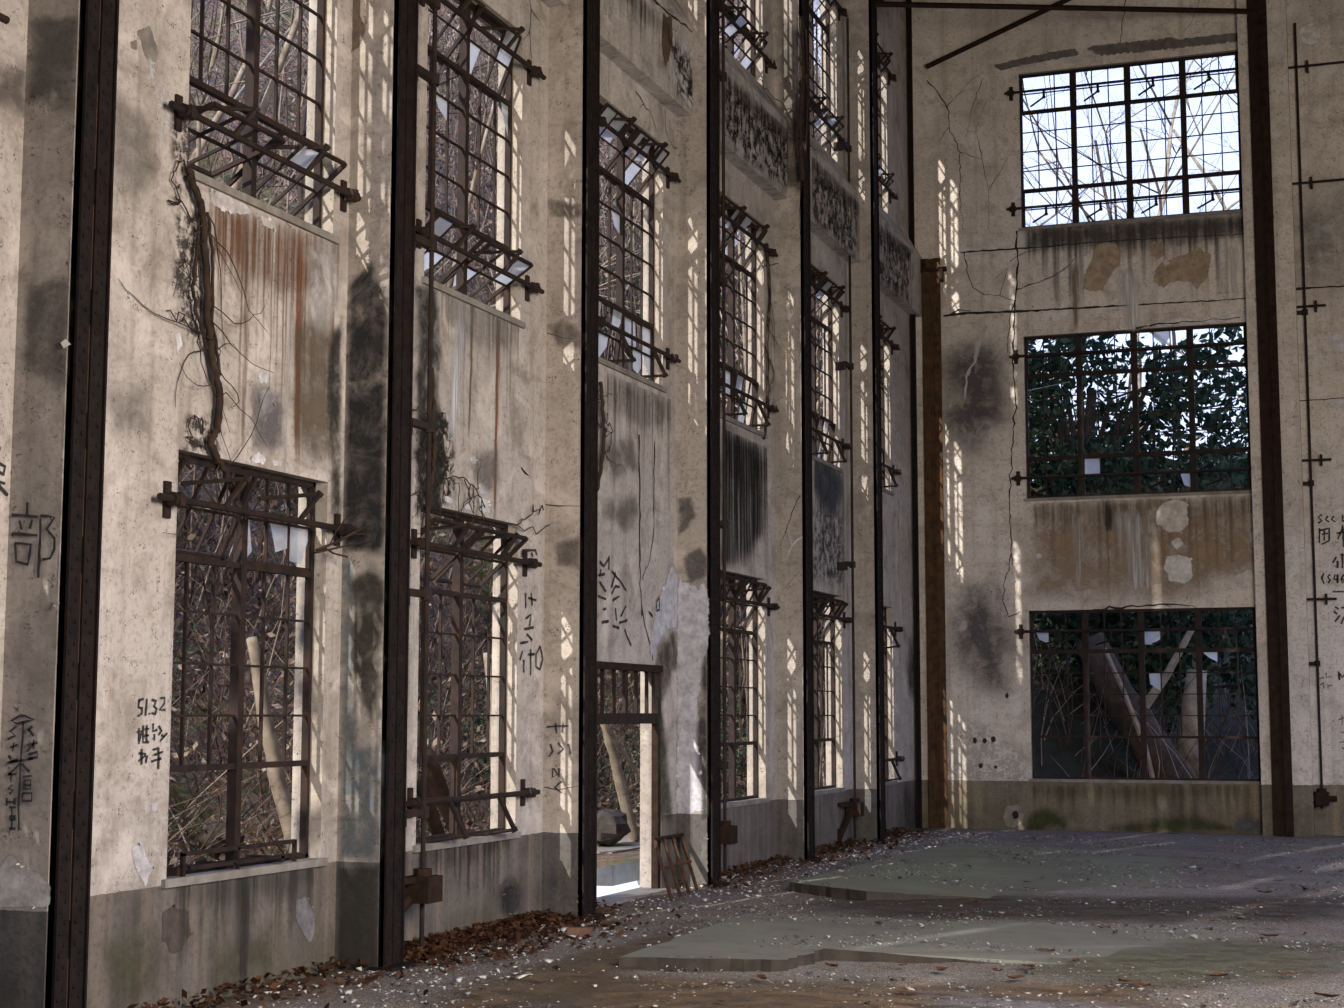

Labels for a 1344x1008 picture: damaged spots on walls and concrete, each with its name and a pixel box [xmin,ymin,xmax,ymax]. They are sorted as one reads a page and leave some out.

flaking render [1083,242,1120,291]
water stain [1030,218,1244,294]
flaking render [1150,241,1211,289]
rust [217,213,339,438]
water stain [948,351,1002,434]
water stain [1037,503,1254,592]
flaking render [1156,500,1193,584]